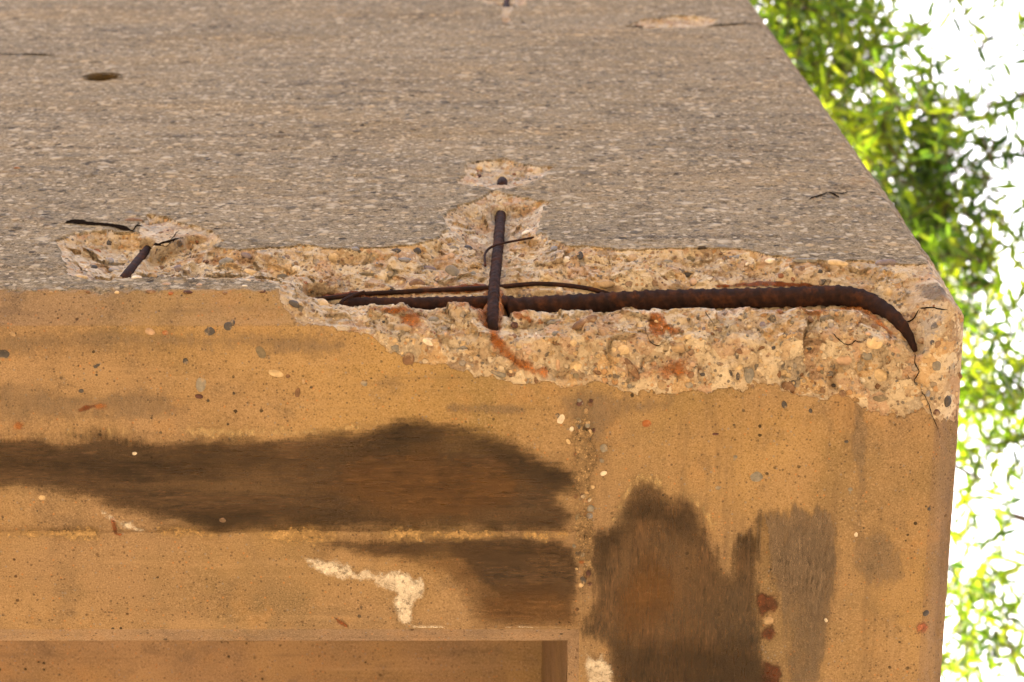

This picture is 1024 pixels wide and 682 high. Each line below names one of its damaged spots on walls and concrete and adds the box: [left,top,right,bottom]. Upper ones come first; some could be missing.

crack [65,219,184,252]
corrosion [322,291,421,326]
corrosion [418,283,547,377]
spalling [57,159,964,423]
corrosion [649,313,677,335]
crack [907,307,947,322]
crack [908,354,957,432]
damp [0,422,577,628]
damp [585,479,836,682]